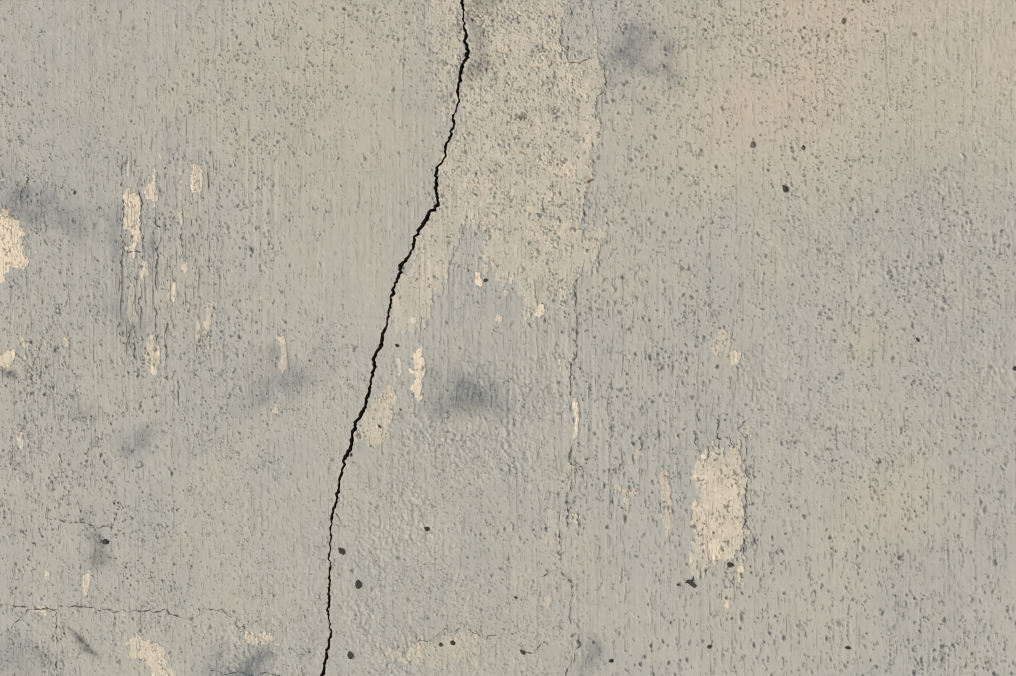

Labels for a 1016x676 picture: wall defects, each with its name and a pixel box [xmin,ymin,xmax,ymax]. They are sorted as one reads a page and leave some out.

spalling [189,162,204,194]
peeling [391,0,612,335]
spalling [0,206,29,283]
peeling [122,160,159,326]
crack [209,0,472,676]
peeling [355,344,426,447]
spalling [571,398,579,438]
crack [45,507,110,530]
crack [542,440,581,676]
peeling [690,436,753,609]
crack [0,604,245,676]
peeling [126,633,177,676]